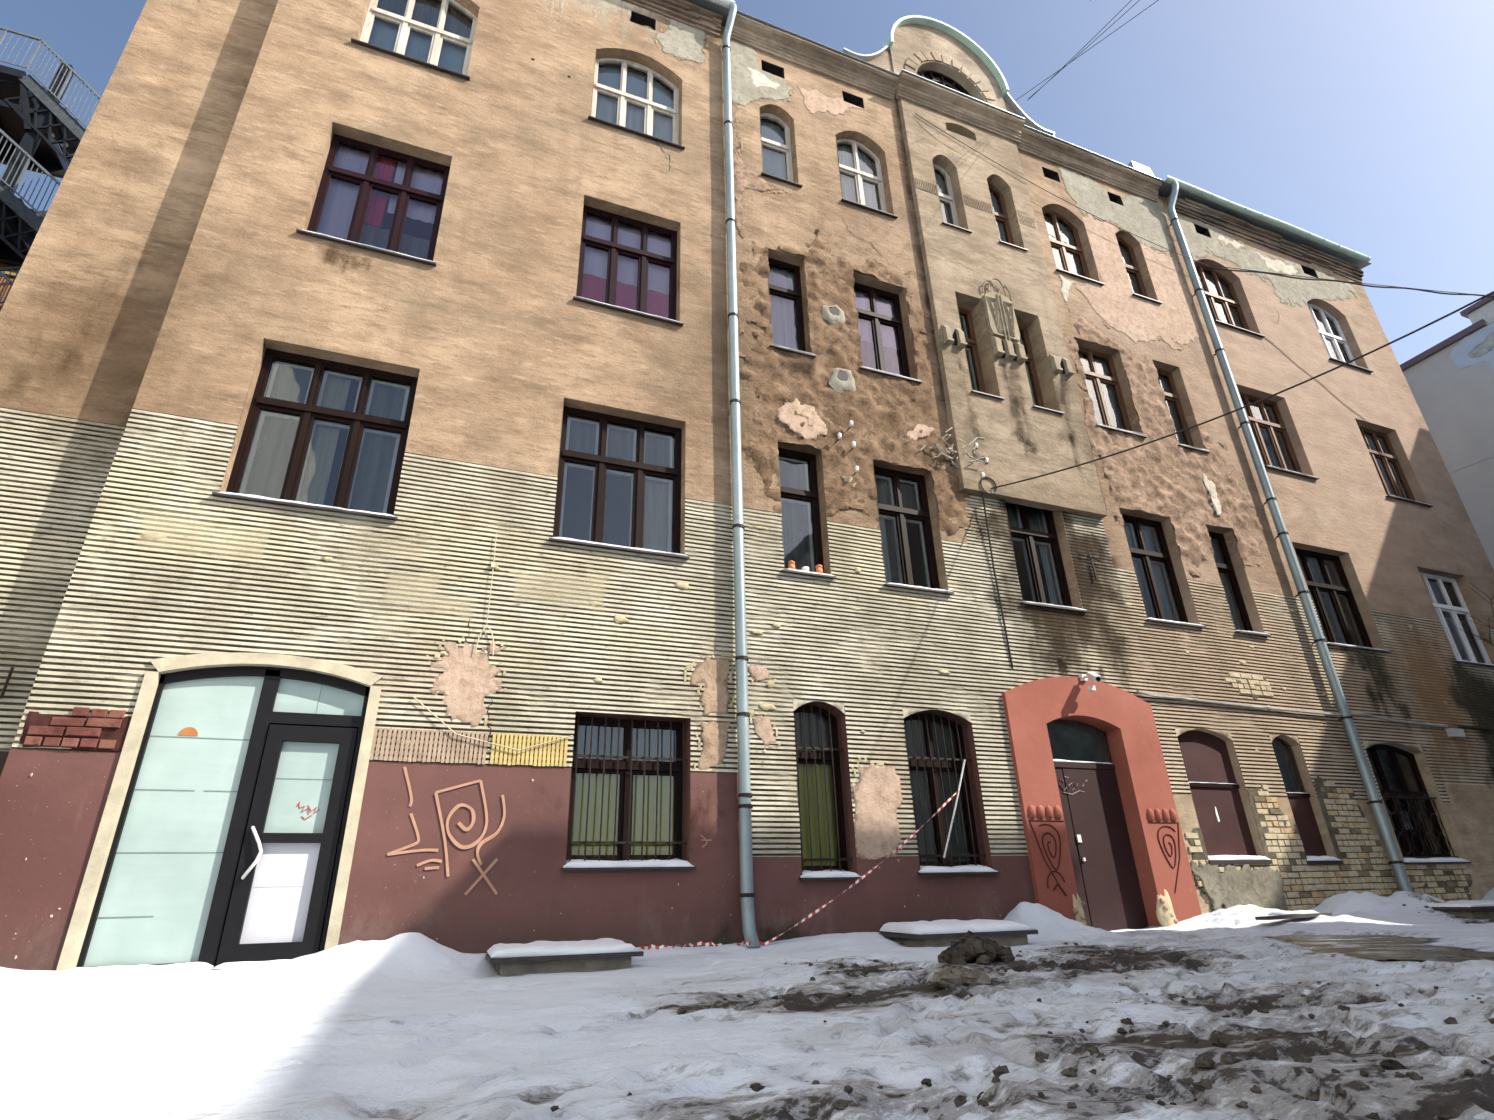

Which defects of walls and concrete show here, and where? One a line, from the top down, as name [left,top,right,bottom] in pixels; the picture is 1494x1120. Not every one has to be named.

flaking render [651,18,980,539]
flaking render [1058,165,1358,576]
flaking render [1468,331,1494,358]
flaking render [19,707,132,751]
flaking render [426,636,507,728]
flaking render [684,654,781,771]
flaking render [1224,672,1274,699]
flaking render [851,758,904,862]
flaking render [1184,775,1473,911]